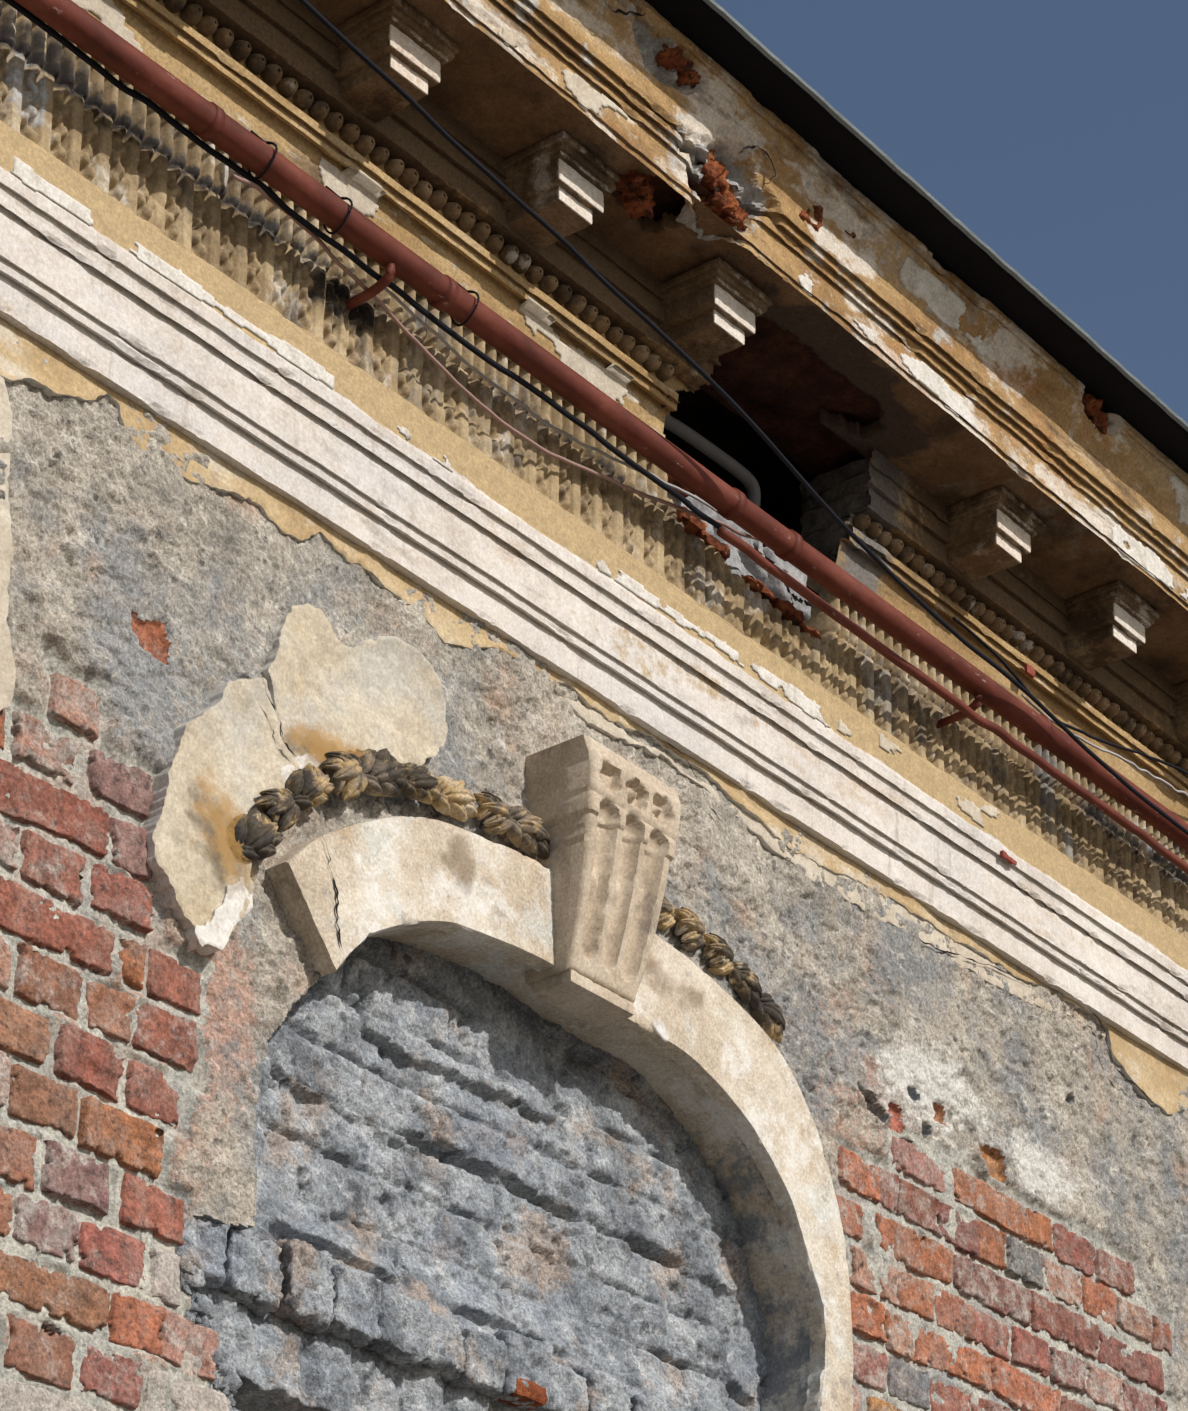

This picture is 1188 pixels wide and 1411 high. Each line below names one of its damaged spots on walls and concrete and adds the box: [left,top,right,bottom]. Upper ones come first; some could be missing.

peeling [71,0,143,52]
peeling [10,156,93,226]
peeling [318,157,387,218]
spalling [696,149,749,232]
crack [737,145,776,185]
peeling [129,241,334,390]
peeling [518,297,635,406]
spalling [1082,393,1109,435]
flaking render [0,317,519,1411]
crack [321,834,343,949]
peeling [535,663,1188,1115]
flaking render [831,1101,1177,1411]